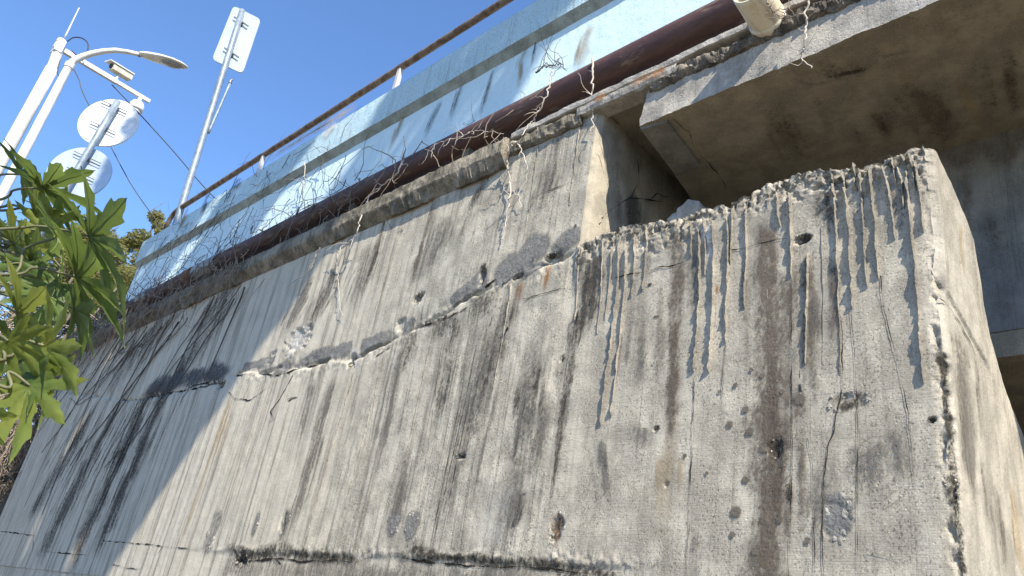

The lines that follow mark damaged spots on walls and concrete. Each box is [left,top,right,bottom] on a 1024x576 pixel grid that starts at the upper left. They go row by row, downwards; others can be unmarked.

rust [576,63,679,120]
spalling [796,234,813,245]
crack [422,279,562,327]
damp [714,91,964,576]
damp [31,288,248,567]
crack [789,279,858,575]
spalling [943,475,961,505]
crack [236,557,348,565]